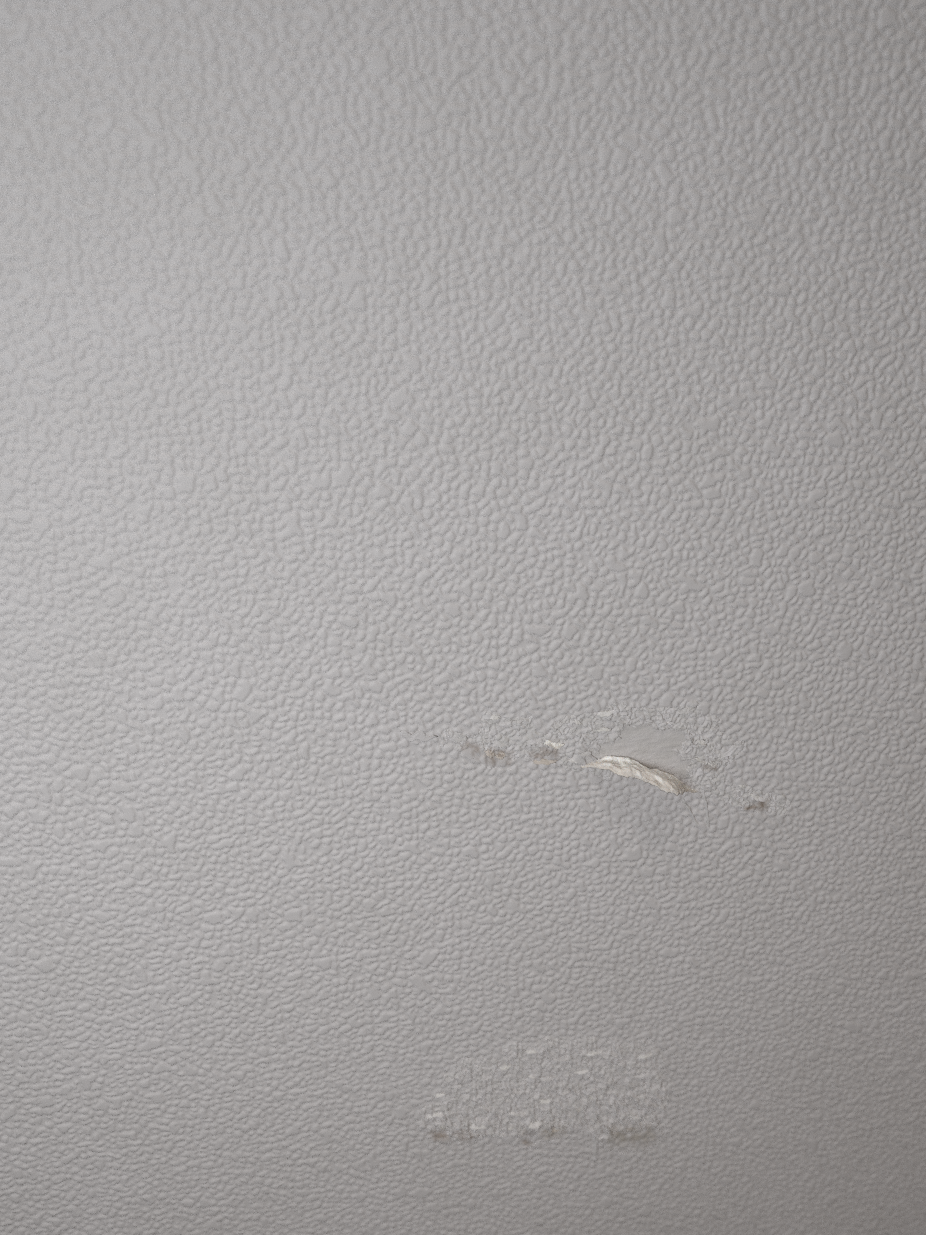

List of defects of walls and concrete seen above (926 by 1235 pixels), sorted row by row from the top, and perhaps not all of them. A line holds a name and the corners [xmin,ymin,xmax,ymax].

peeling [526,738,699,796]